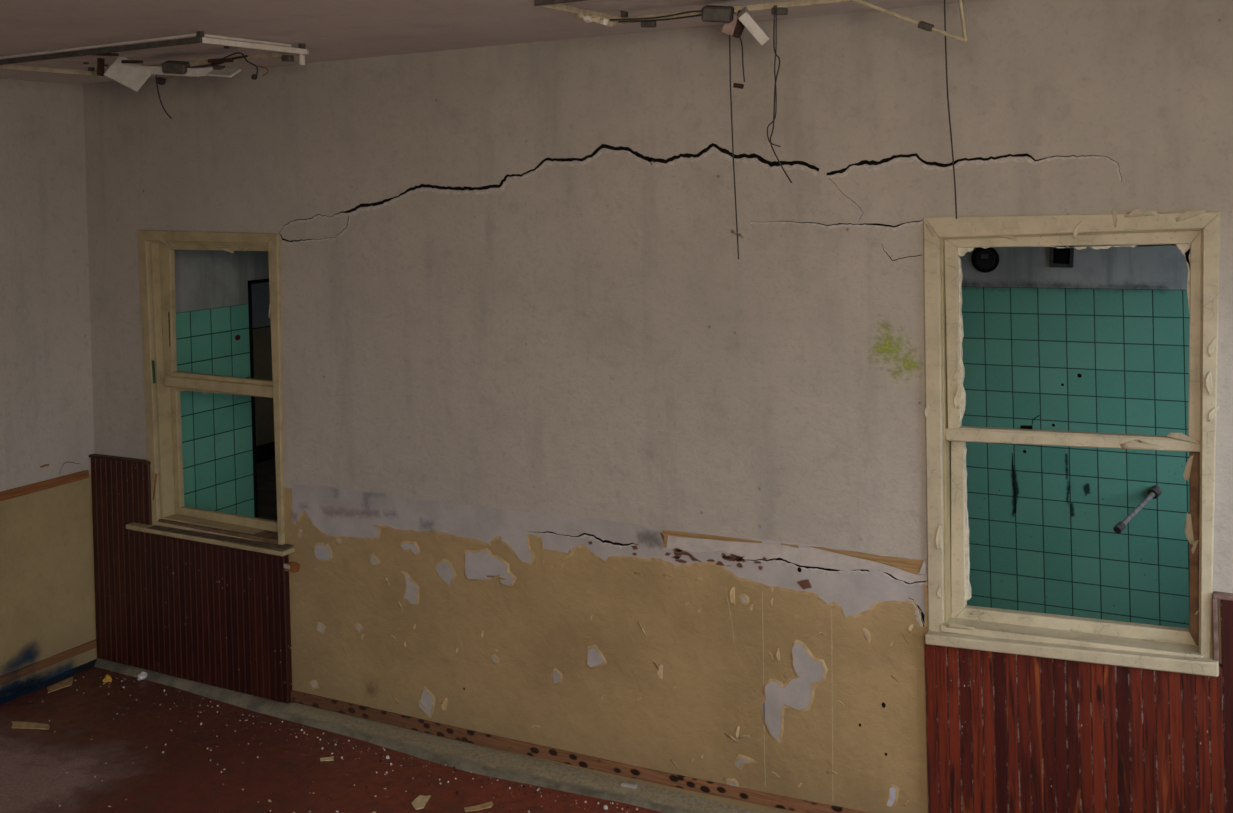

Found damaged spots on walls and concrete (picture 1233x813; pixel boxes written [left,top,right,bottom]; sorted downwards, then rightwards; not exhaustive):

crack [279,143,1122,261]
crack [528,531,639,549]
flaking render [291,484,928,647]
peeling [586,645,607,669]
peeling [417,686,448,718]
peeling [760,639,828,744]
peeling [723,726,758,787]